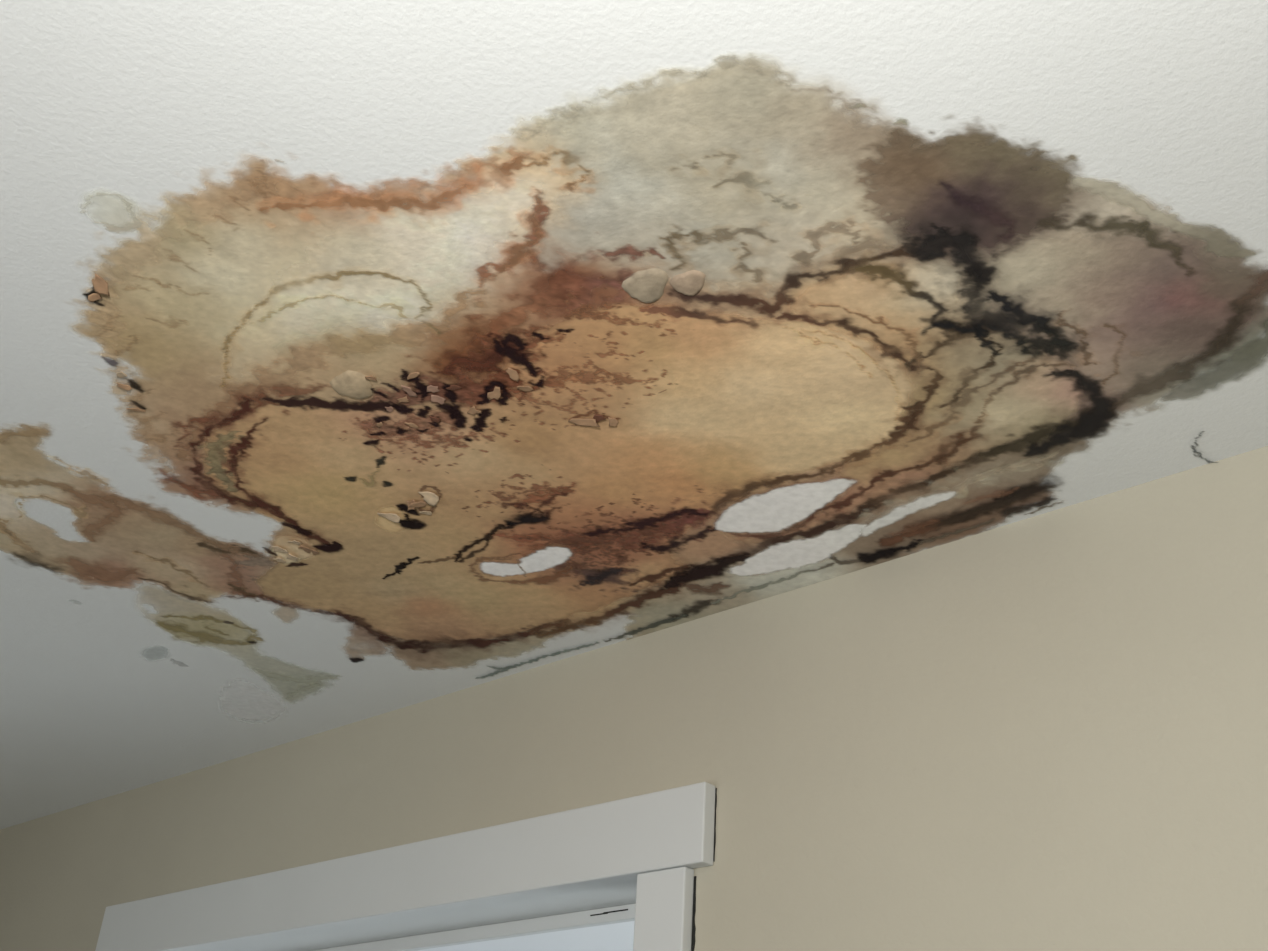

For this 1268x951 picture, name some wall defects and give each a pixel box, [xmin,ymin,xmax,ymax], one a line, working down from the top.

damp [0,59,1268,702]
peeling [469,545,573,584]
peeling [715,479,955,576]